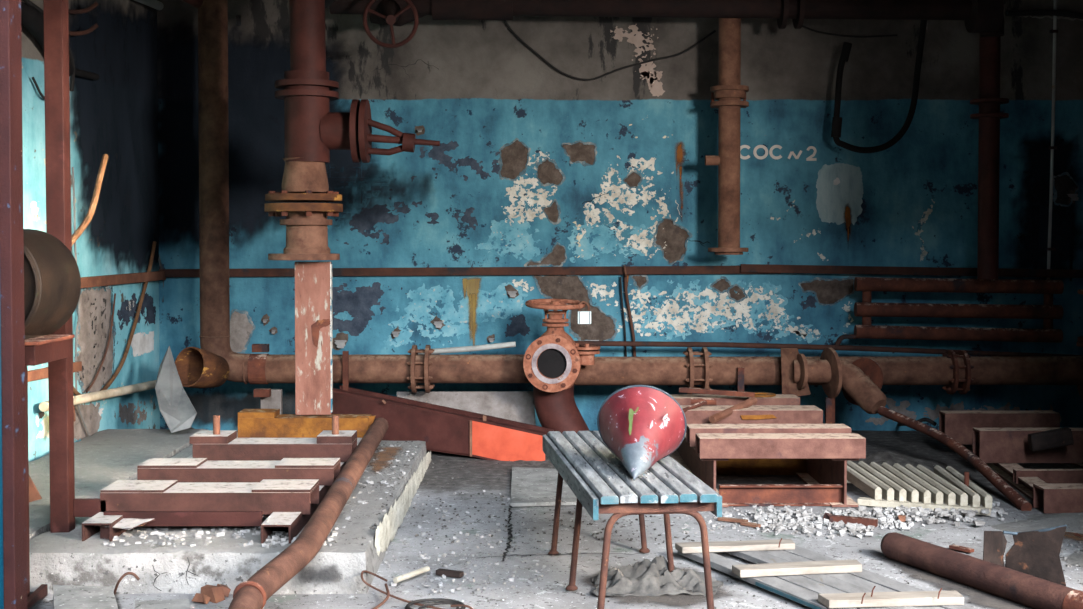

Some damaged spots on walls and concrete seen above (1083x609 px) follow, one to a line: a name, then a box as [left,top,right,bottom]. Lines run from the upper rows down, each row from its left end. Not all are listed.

peeling [332,125,855,350]
peeling [36,412,49,439]
flaking render [74,286,156,441]